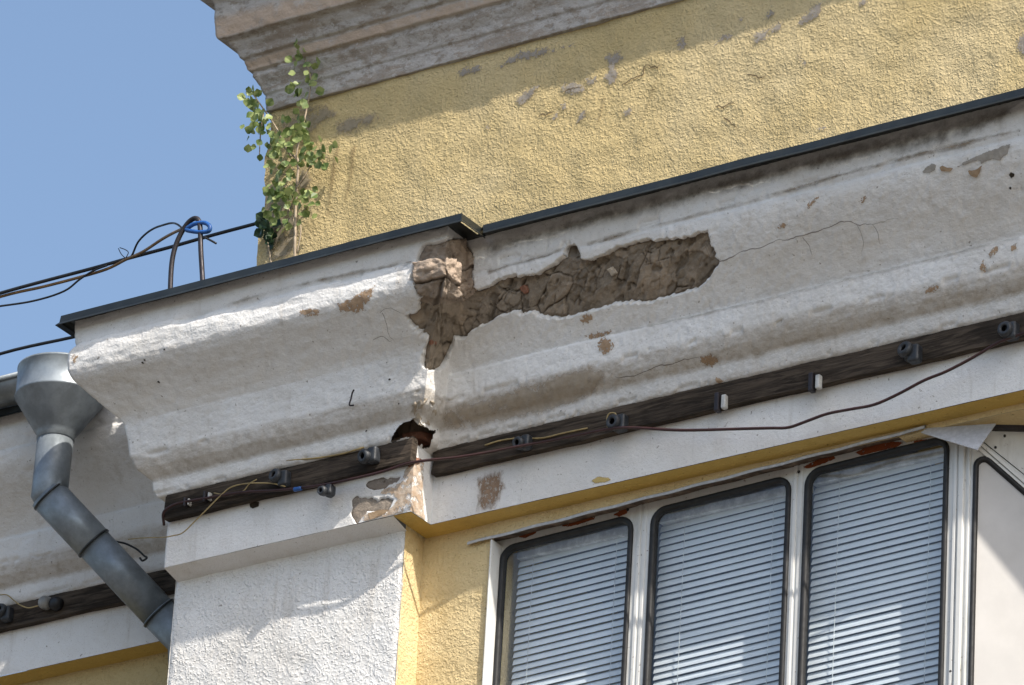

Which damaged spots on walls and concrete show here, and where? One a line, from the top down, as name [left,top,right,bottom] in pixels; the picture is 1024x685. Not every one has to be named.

peeling [923,144,1010,177]
crack [704,218,898,262]
flaking render [337,285,375,314]
flaking render [409,232,719,370]
peeling [352,398,438,523]